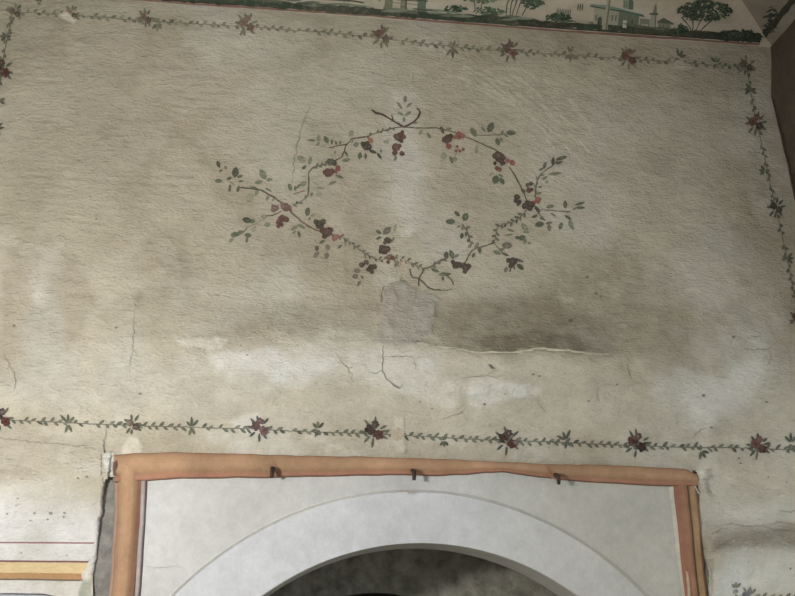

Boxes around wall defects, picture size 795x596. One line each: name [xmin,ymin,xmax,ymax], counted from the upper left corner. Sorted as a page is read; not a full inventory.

leakage [114,153,390,350]
crack [337,339,423,389]
leakage [426,220,740,389]
crack [705,510,795,586]